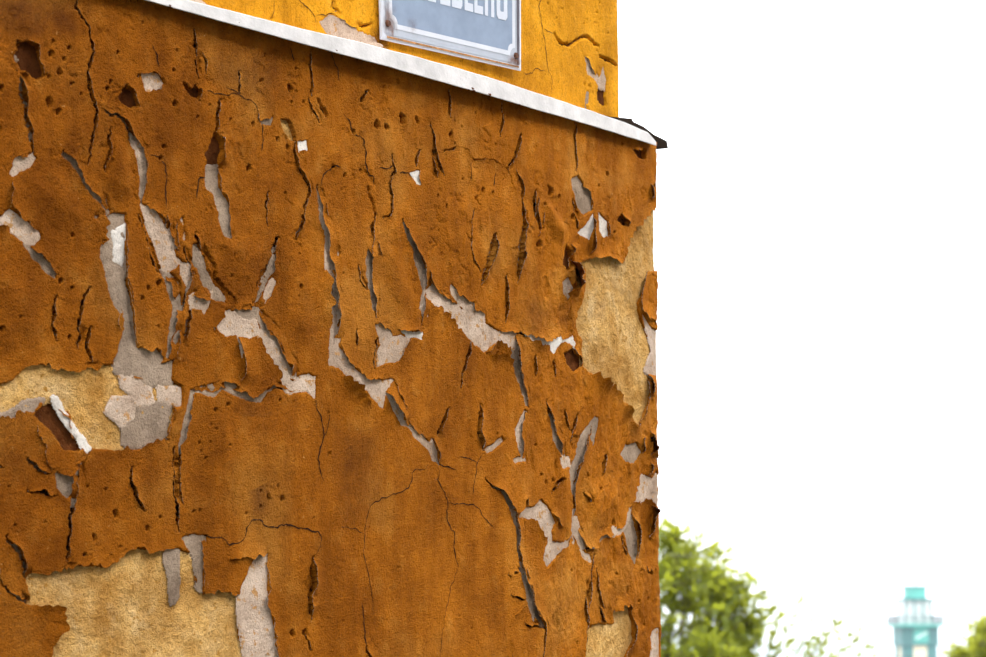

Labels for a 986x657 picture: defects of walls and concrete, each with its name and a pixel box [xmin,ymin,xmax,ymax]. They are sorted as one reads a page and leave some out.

crack [13,43,45,152]
spalling [118,62,166,108]
spalling [258,109,309,157]
peeling [585,53,606,109]
crack [51,288,96,361]
peeling [0,134,316,508]
crack [64,0,639,657]
peeling [316,176,661,629]
crack [26,453,87,561]
crack [5,533,36,603]
peeling [23,534,284,657]
peeling [585,593,659,657]